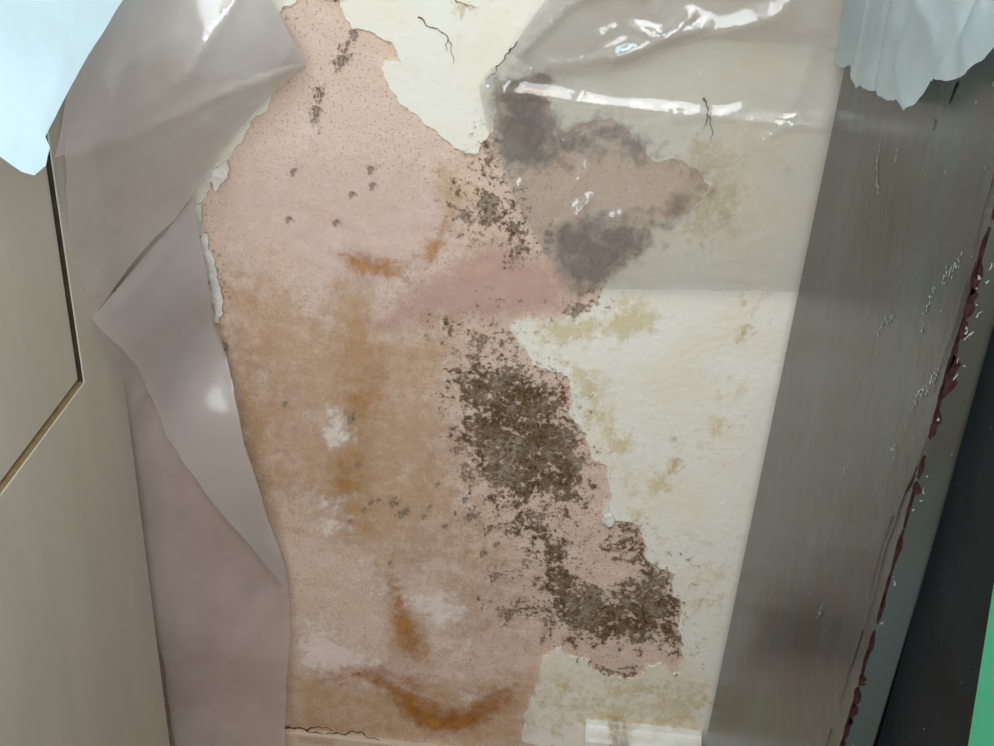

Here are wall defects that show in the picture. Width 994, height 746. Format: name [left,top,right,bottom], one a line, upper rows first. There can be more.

damp [332,29,362,72]
crack [418,17,454,62]
peeling [194,0,708,746]
damp [240,75,689,692]
peeling [154,620,176,746]